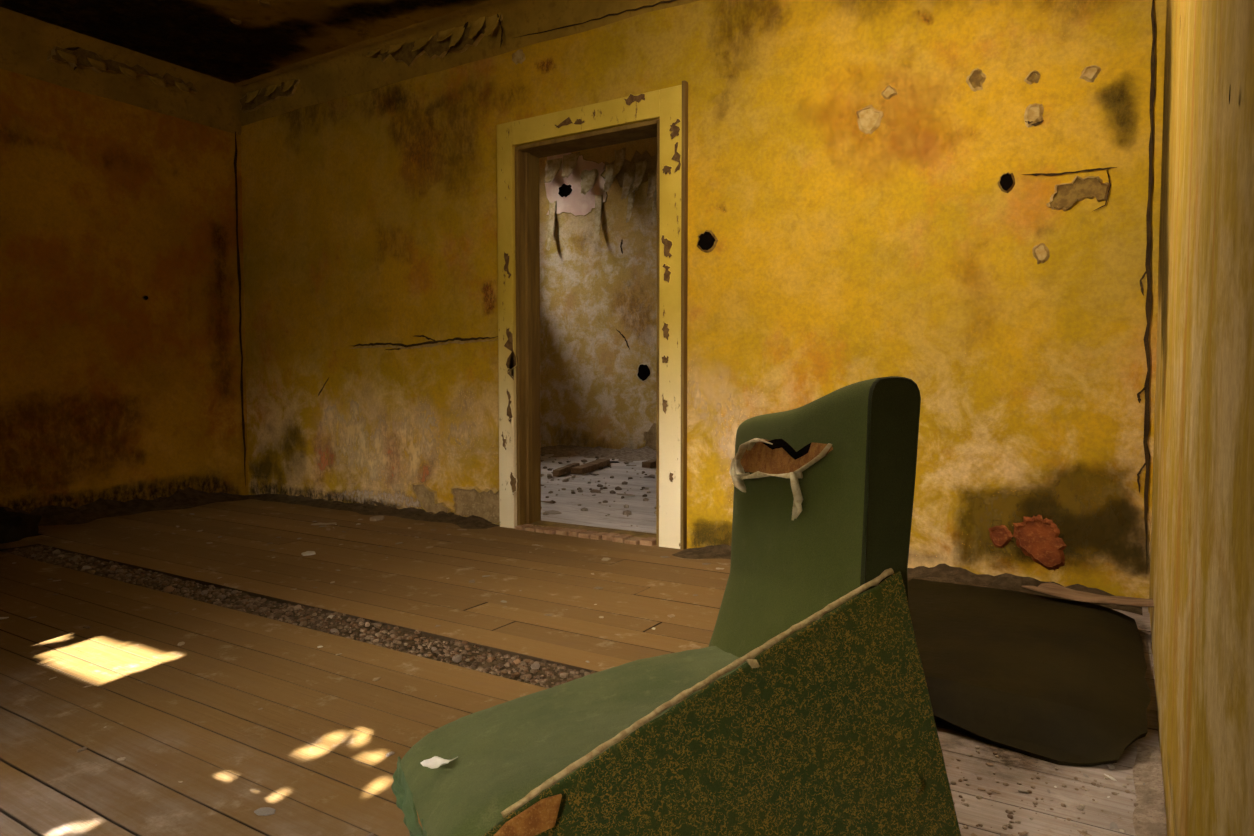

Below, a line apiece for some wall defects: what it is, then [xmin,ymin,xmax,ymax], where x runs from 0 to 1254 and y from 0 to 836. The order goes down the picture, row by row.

flaking render [367,13,503,68]
peeling [554,116,586,129]
peeling [544,118,681,284]
flaking render [1046,175,1112,212]
crack [1137,0,1156,573]
crack [353,335,498,350]
water stain [957,463,1150,572]